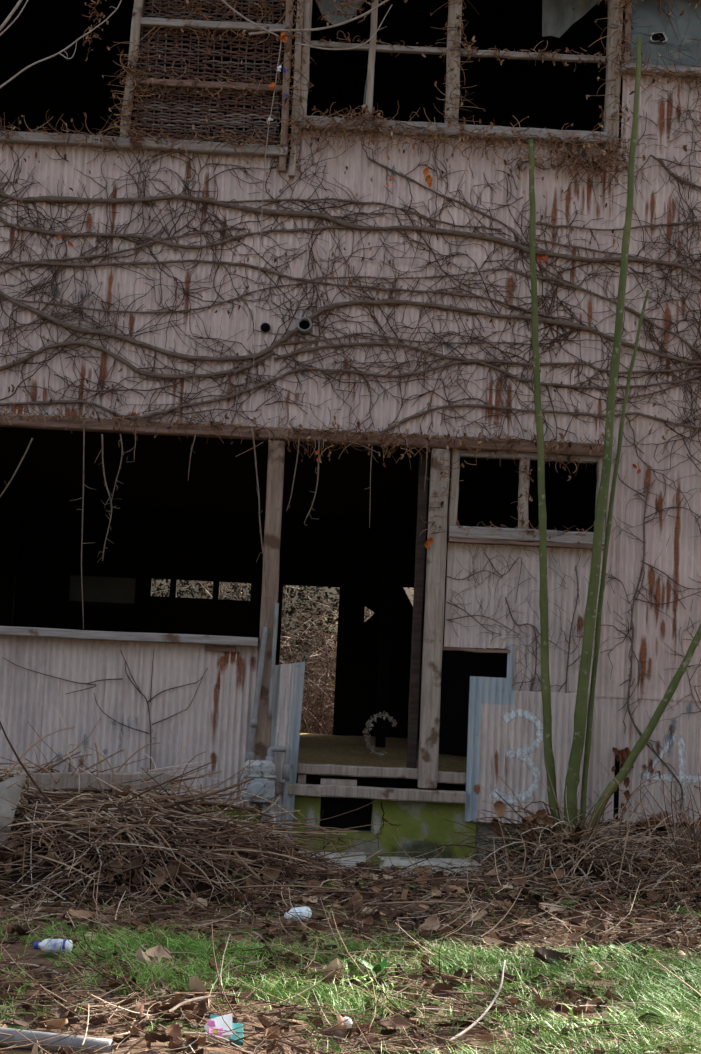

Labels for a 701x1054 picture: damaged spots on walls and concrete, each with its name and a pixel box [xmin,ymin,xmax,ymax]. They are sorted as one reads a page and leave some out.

corrosion [658,88,681,137]
corrosion [107,270,134,337]
corrosion [485,376,511,424]
corrosion [644,468,663,529]
corrosion [638,485,681,686]
corrosion [213,651,256,731]
corrosion [611,741,661,811]
leakage [401,841,451,859]